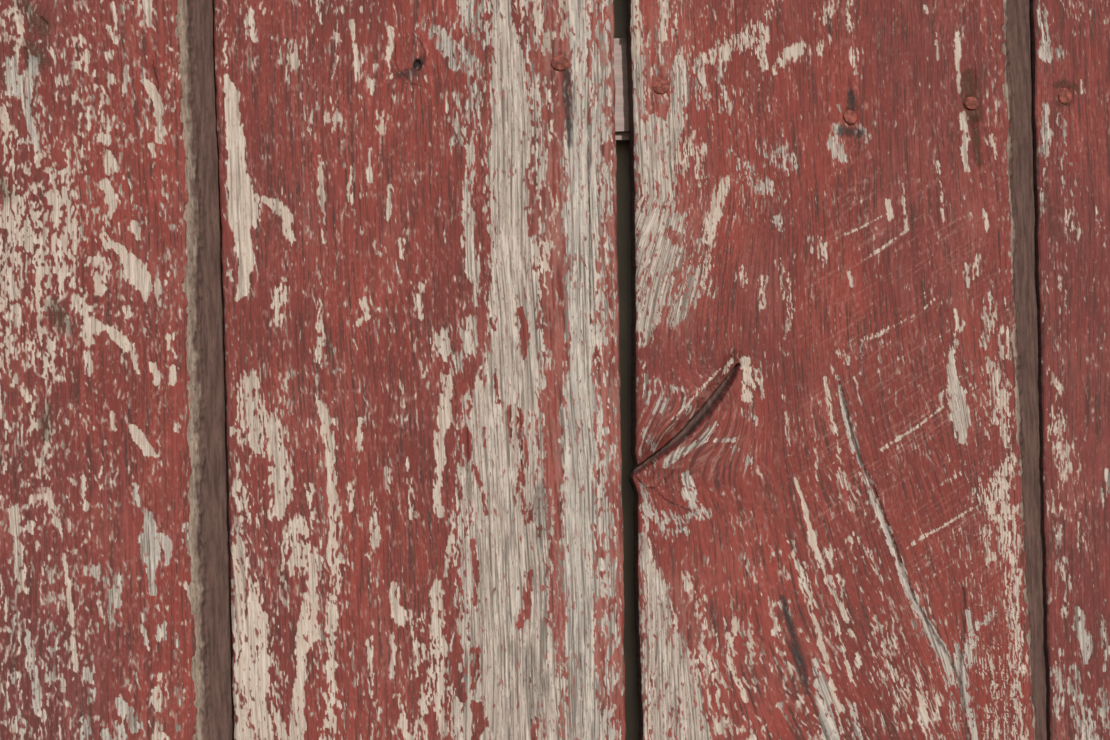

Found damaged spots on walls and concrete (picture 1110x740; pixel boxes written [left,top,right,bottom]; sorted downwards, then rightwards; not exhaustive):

peeling [0,0,177,740]
peeling [132,483,189,656]
peeling [223,33,296,301]
peeling [230,370,356,740]
peeling [334,20,375,95]
peeling [389,0,624,740]
crack [633,364,740,516]
peeling [638,422,772,740]
peeling [630,0,855,425]
peeling [771,477,863,740]
crack [837,377,971,740]
peeling [823,291,1029,740]